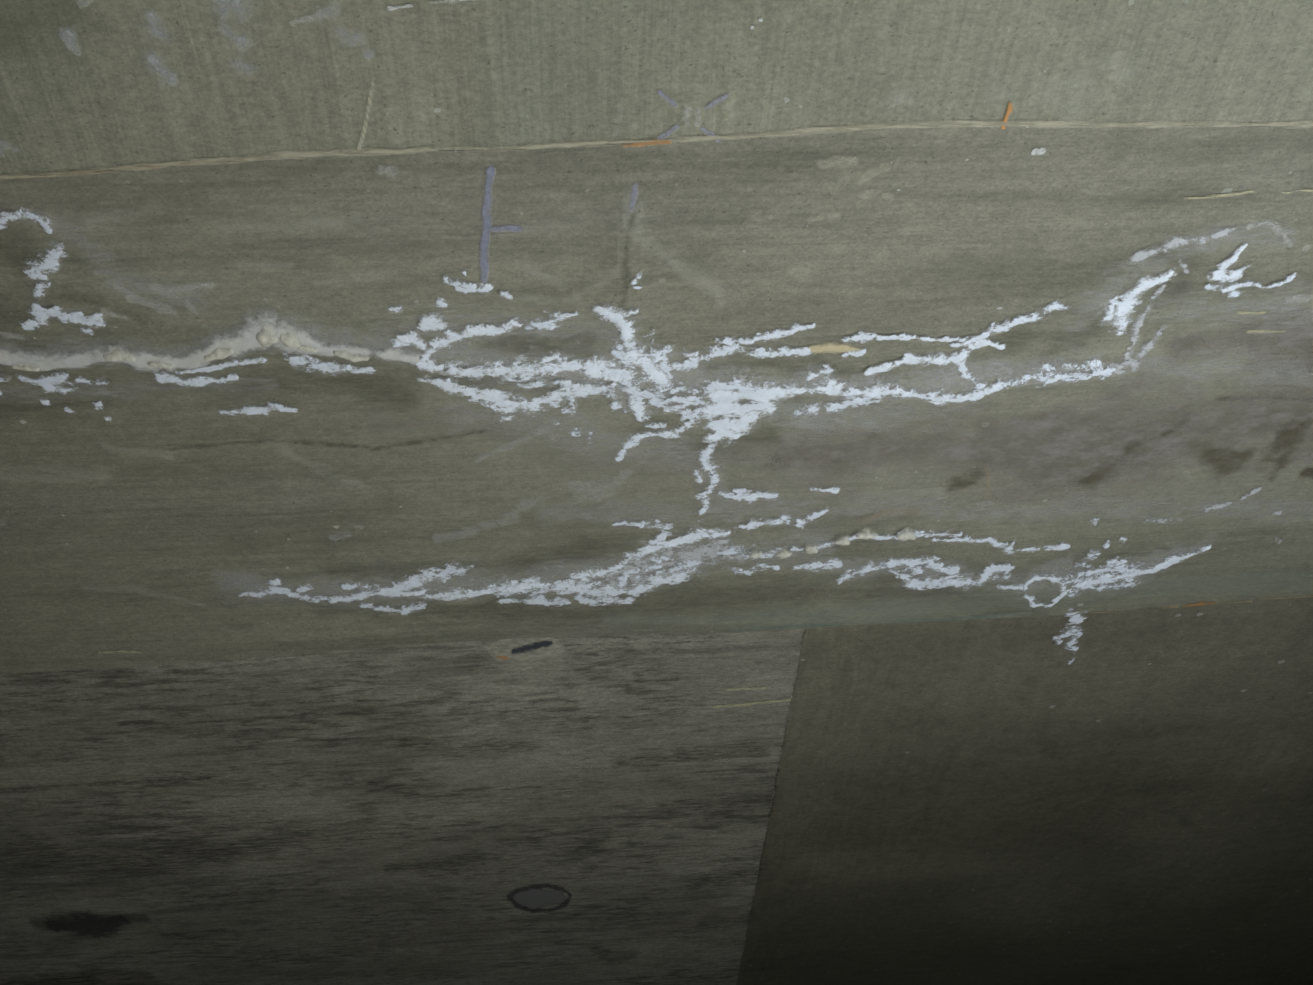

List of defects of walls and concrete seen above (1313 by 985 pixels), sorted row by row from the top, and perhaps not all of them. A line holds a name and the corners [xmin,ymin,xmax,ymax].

crack [630,273,642,289]
water stain [0,206,1313,664]